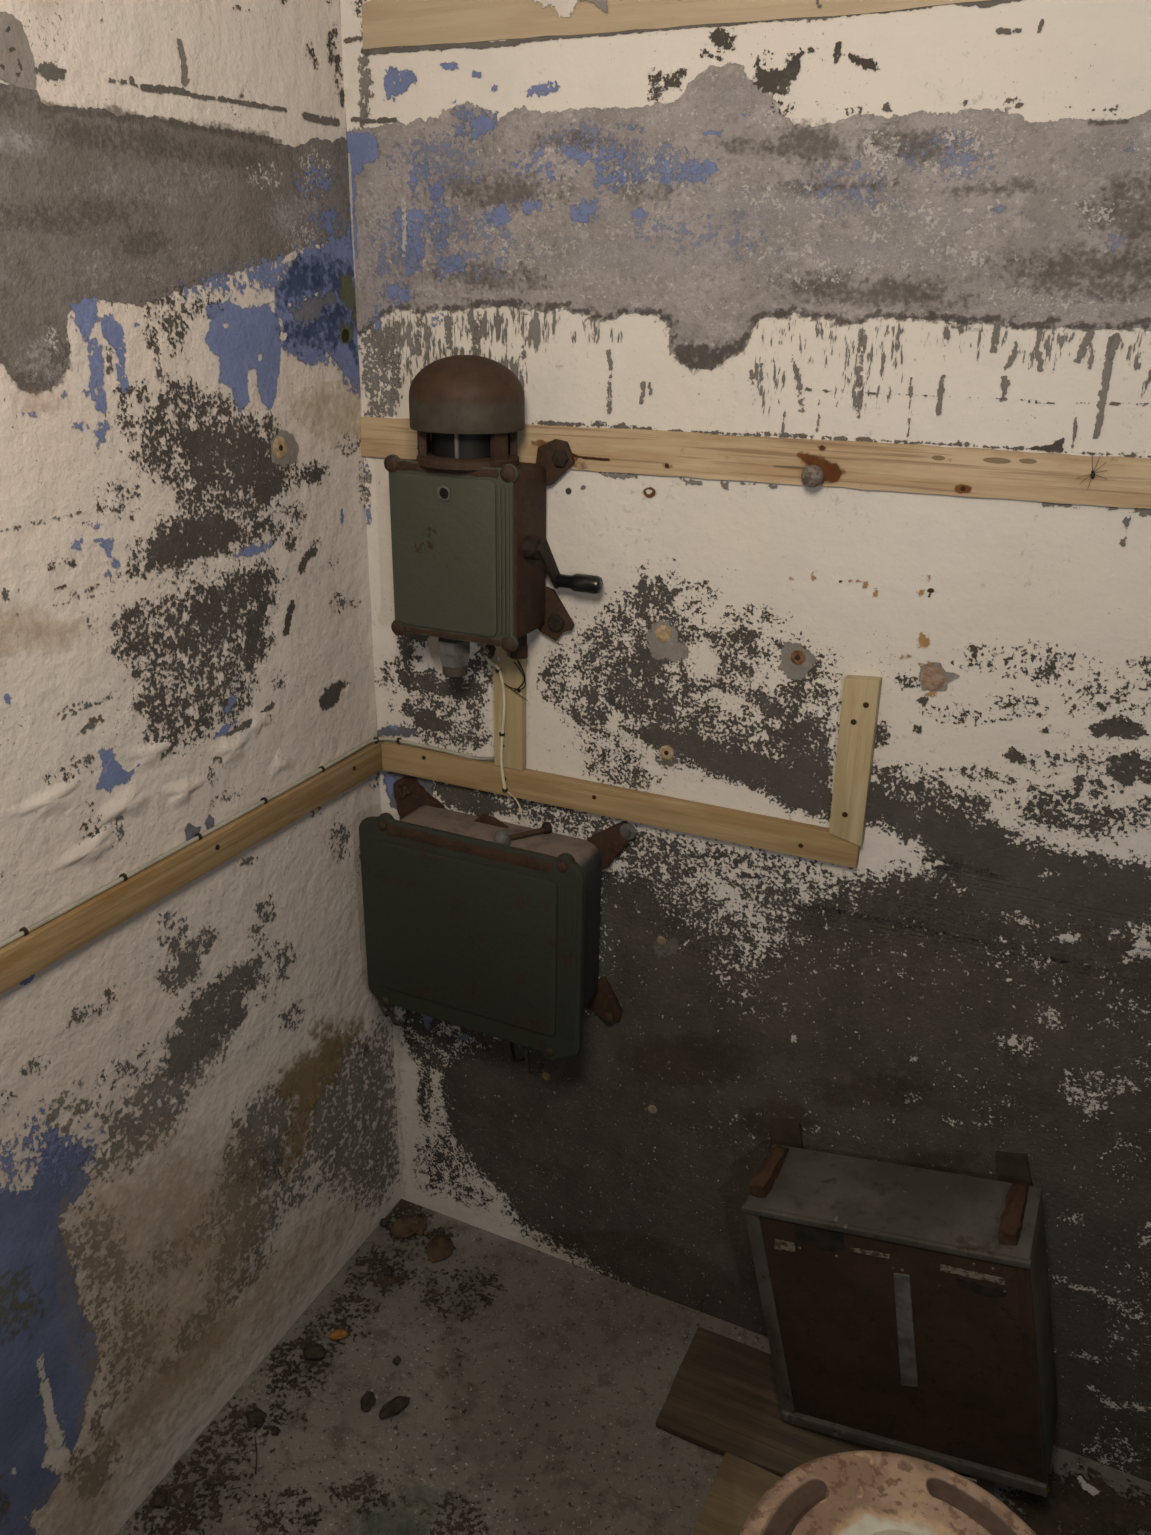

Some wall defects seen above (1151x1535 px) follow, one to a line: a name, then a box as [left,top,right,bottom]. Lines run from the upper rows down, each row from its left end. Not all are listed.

spalling [0,0,1151,848]
leakage [639,381,652,404]
leakage [781,355,820,435]
leakage [855,330,867,418]
leakage [935,374,946,415]
leakage [989,321,1044,402]
leakage [1071,329,1121,448]
corrosion [797,447,845,483]
corrosion [901,632,934,668]
peeling [21,1056,62,1075]
leakage [276,1020,363,1183]
peeling [32,638,1151,1503]